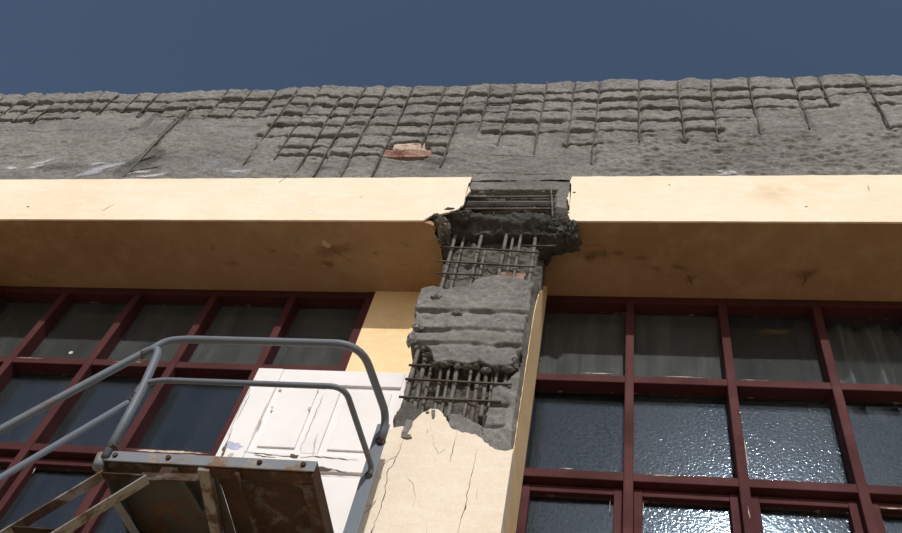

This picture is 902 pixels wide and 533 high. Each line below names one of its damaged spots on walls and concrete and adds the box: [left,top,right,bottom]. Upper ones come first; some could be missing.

spalling [0,74,902,178]
spalling [393,179,582,450]
crack [370,438,415,533]